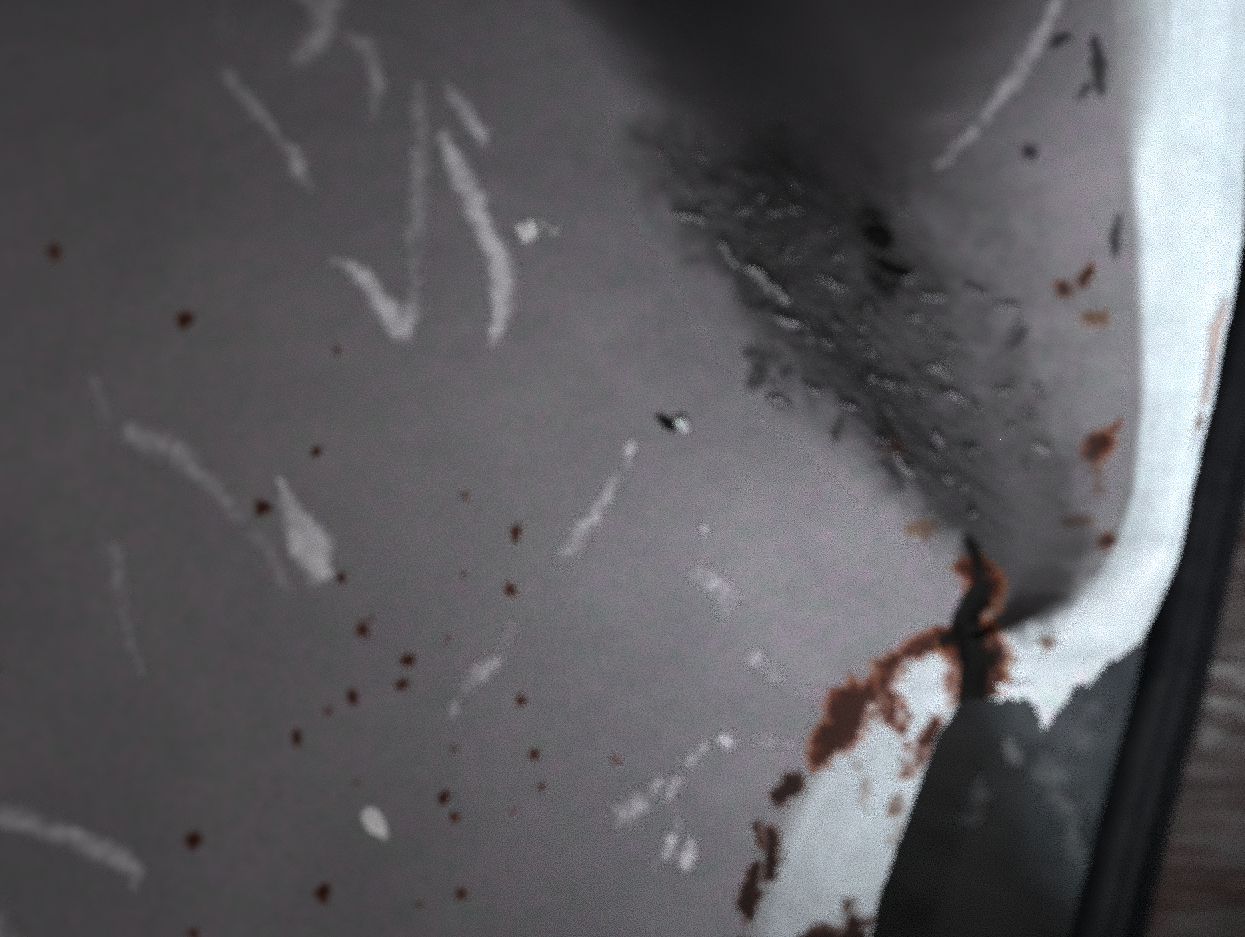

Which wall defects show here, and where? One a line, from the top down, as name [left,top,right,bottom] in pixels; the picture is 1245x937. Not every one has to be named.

corrosion [952,557,1015,700]
peeling [1041,637,1054,651]
corrosion [769,626,962,809]
peeling [996,647,1117,730]
corrosion [888,795,902,816]
corrosion [735,821,783,927]
corrosion [797,899,874,937]